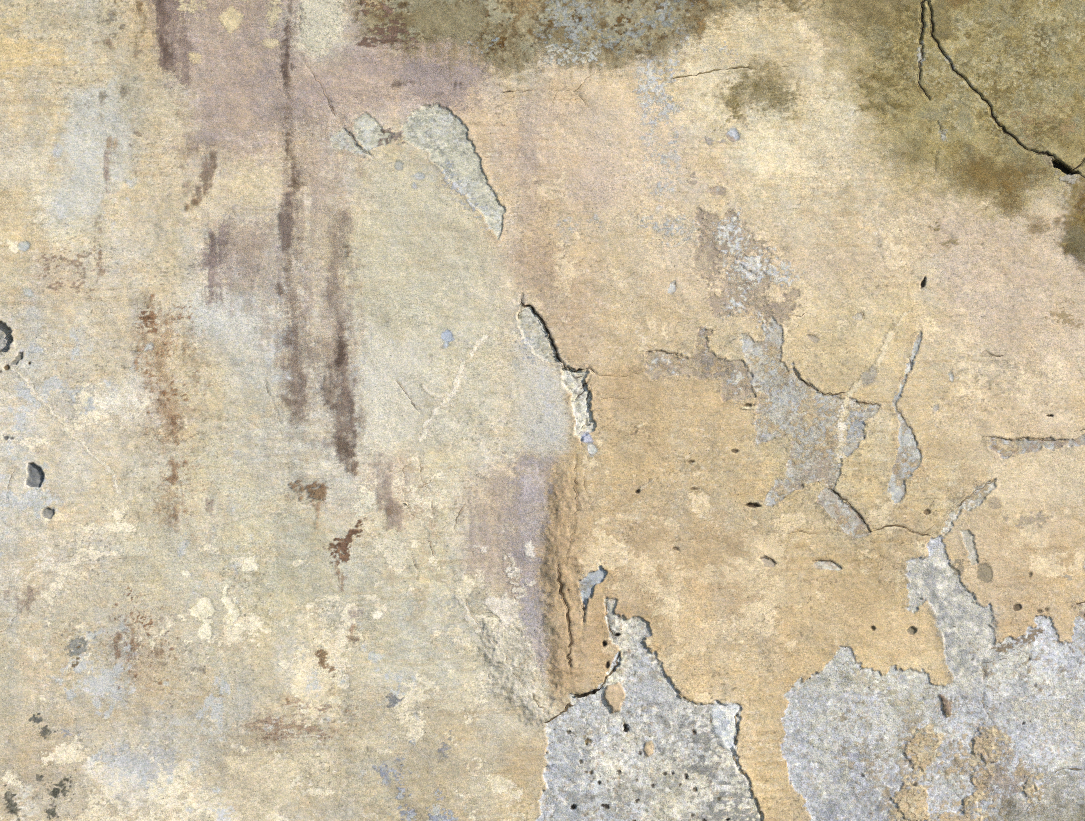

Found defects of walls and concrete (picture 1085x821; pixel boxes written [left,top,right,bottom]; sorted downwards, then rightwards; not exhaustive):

crack [917,0,1085,184]
peeling [330,101,506,240]
spalling [0,322,30,372]
corrosion [136,294,191,333]
crack [518,295,643,399]
peeling [638,186,923,538]
corrosion [289,480,328,518]
corrosion [328,518,365,580]
crack [395,334,620,723]
peeling [484,541,536,631]
spalling [536,566,763,821]
spalling [780,479,1085,821]